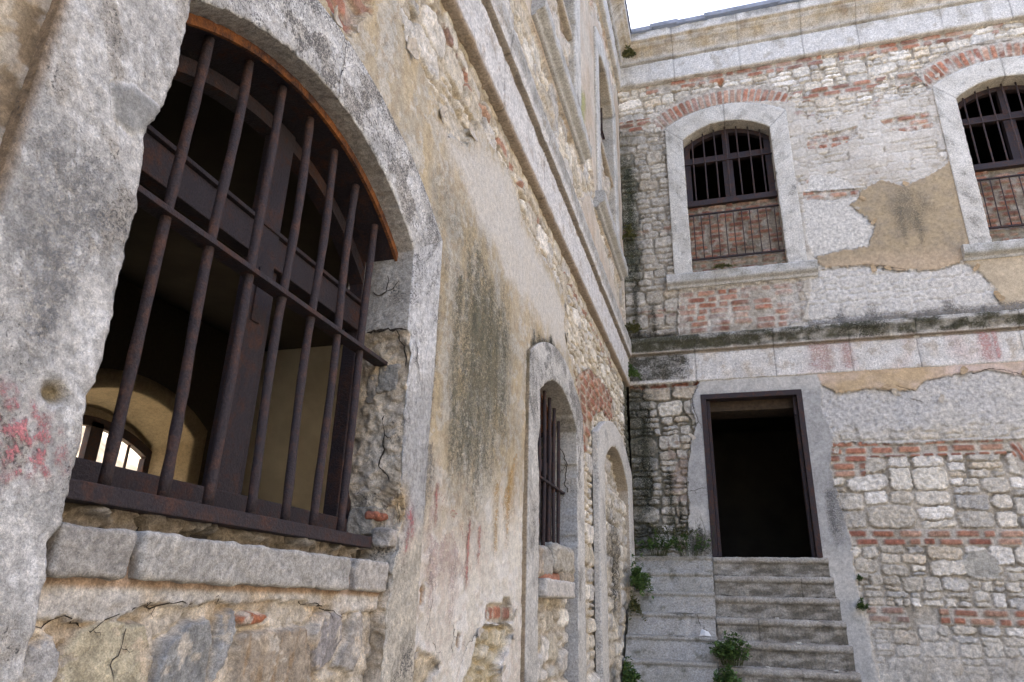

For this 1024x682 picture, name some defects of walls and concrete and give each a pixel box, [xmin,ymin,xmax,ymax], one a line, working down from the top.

crack [35,595,225,678]
crack [298,601,342,618]
spalling [346,330,411,682]
crack [378,416,392,482]
water stain [449,235,517,549]
flaking render [399,0,700,682]
water stain [626,170,656,333]
flaking render [504,0,1024,339]
flaking render [816,362,1024,682]